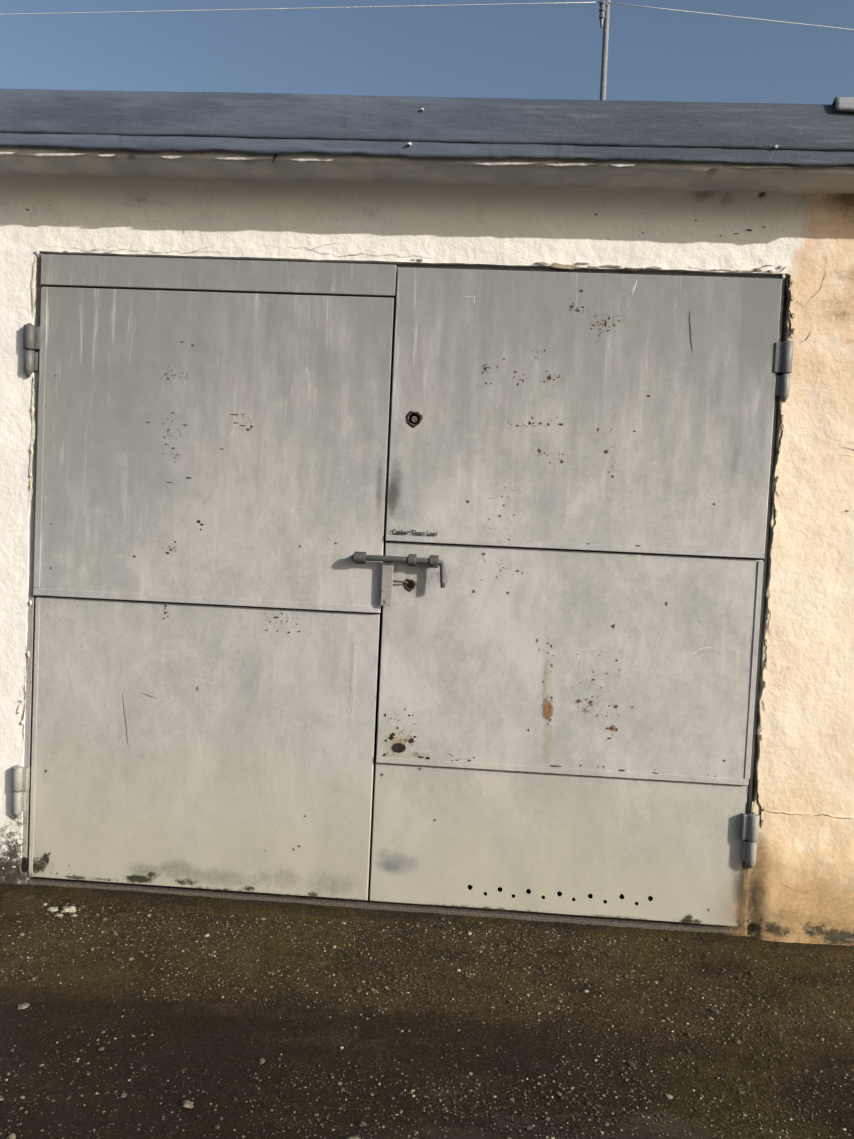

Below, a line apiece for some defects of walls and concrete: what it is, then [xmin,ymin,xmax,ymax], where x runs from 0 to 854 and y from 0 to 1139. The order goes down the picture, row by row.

rust [541,696,553,725]
damp [0,817,34,886]
damp [745,854,854,946]